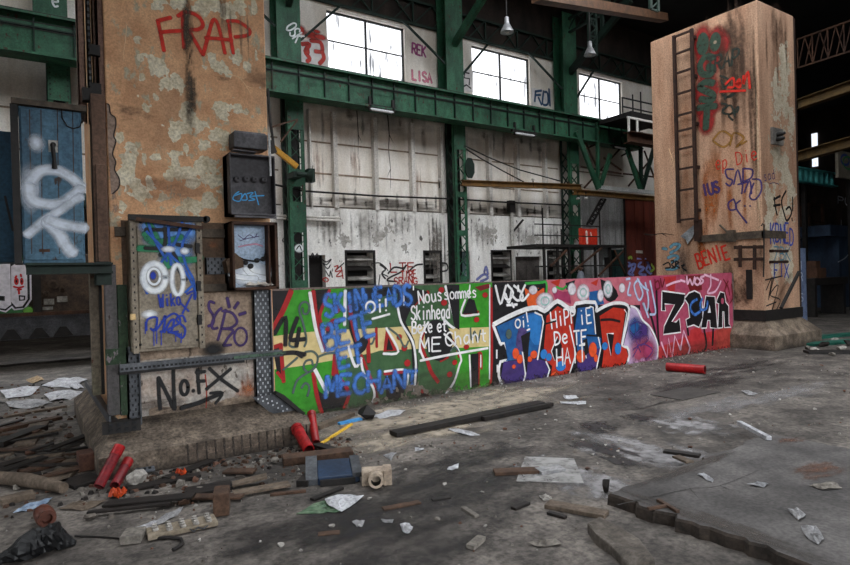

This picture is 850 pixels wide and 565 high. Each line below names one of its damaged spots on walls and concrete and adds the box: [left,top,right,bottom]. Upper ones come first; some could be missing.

peeling [106,36,258,218]
leakage [183,0,196,118]
leakage [429,219,446,277]
peeling [756,40,797,289]